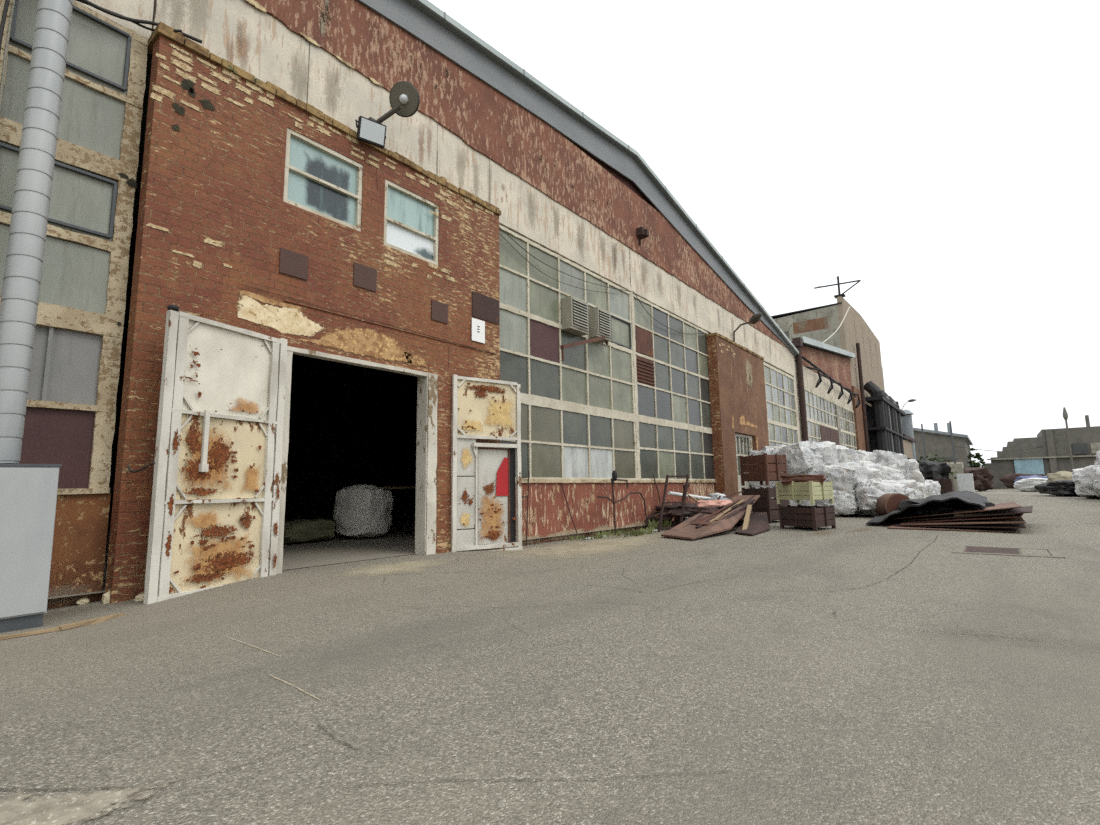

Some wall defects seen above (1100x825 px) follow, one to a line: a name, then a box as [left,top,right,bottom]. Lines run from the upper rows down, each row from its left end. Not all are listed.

peeling [150,43,275,112]
peeling [374,21,465,98]
peeling [117,173,137,188]
peeling [288,113,494,230]
peeling [501,113,574,195]
peeling [411,263,455,282]
spalling [237,290,427,367]
rust [185,348,202,398]
rust [215,398,258,414]
rust [460,379,508,415]
rust [169,416,280,593]
rust [459,482,517,542]